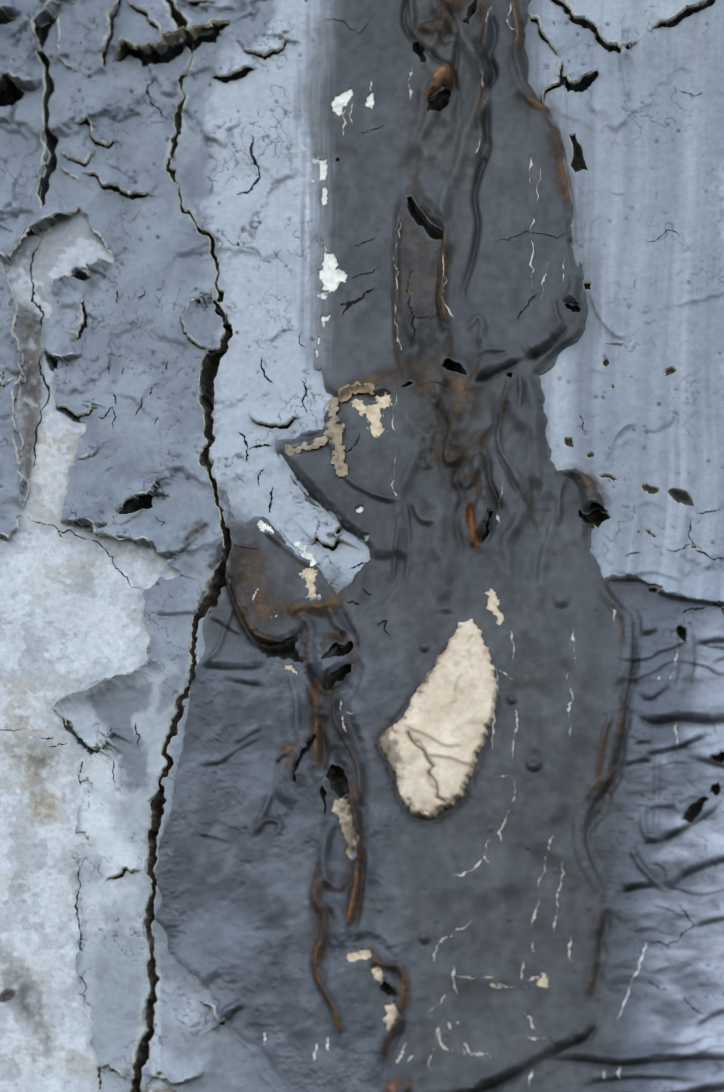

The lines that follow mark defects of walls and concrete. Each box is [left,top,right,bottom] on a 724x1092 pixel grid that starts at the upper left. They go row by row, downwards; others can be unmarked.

corrosion [426,66,453,98]
peeling [527,0,715,103]
corrosion [524,95,569,201]
crack [30,237,44,326]
spalling [318,246,347,299]
crack [33,354,50,466]
peeling [249,381,392,477]
crack [28,512,142,590]
peeling [0,0,304,1092]
crack [99,0,277,1092]
spalling [380,619,498,819]
crack [74,855,87,1008]